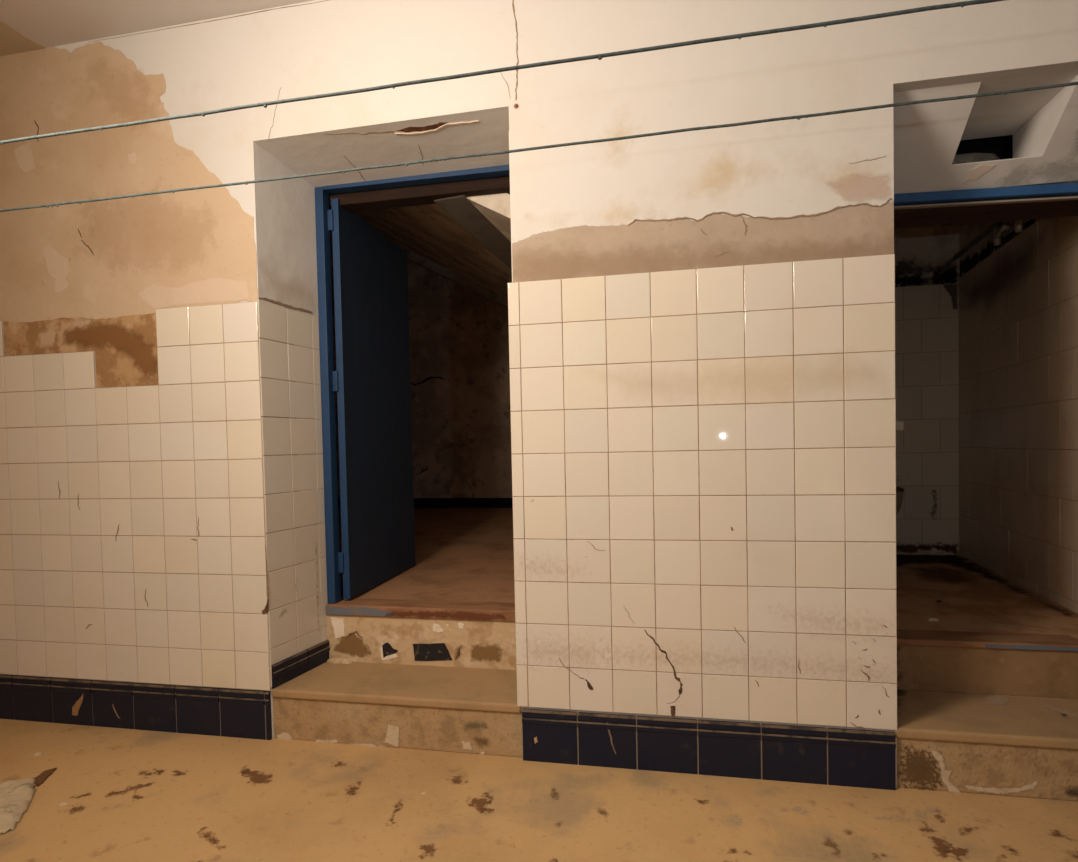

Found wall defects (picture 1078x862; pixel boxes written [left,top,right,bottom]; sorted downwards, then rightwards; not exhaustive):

crack [91,0,328,42]
crack [501,0,519,100]
spalling [332,120,479,135]
peeling [0,20,258,388]
peeling [512,156,894,282]
water stain [895,219,1035,309]
spalling [326,606,398,660]
spalling [413,623,501,661]
crack [559,658,593,690]
crack [624,607,683,717]